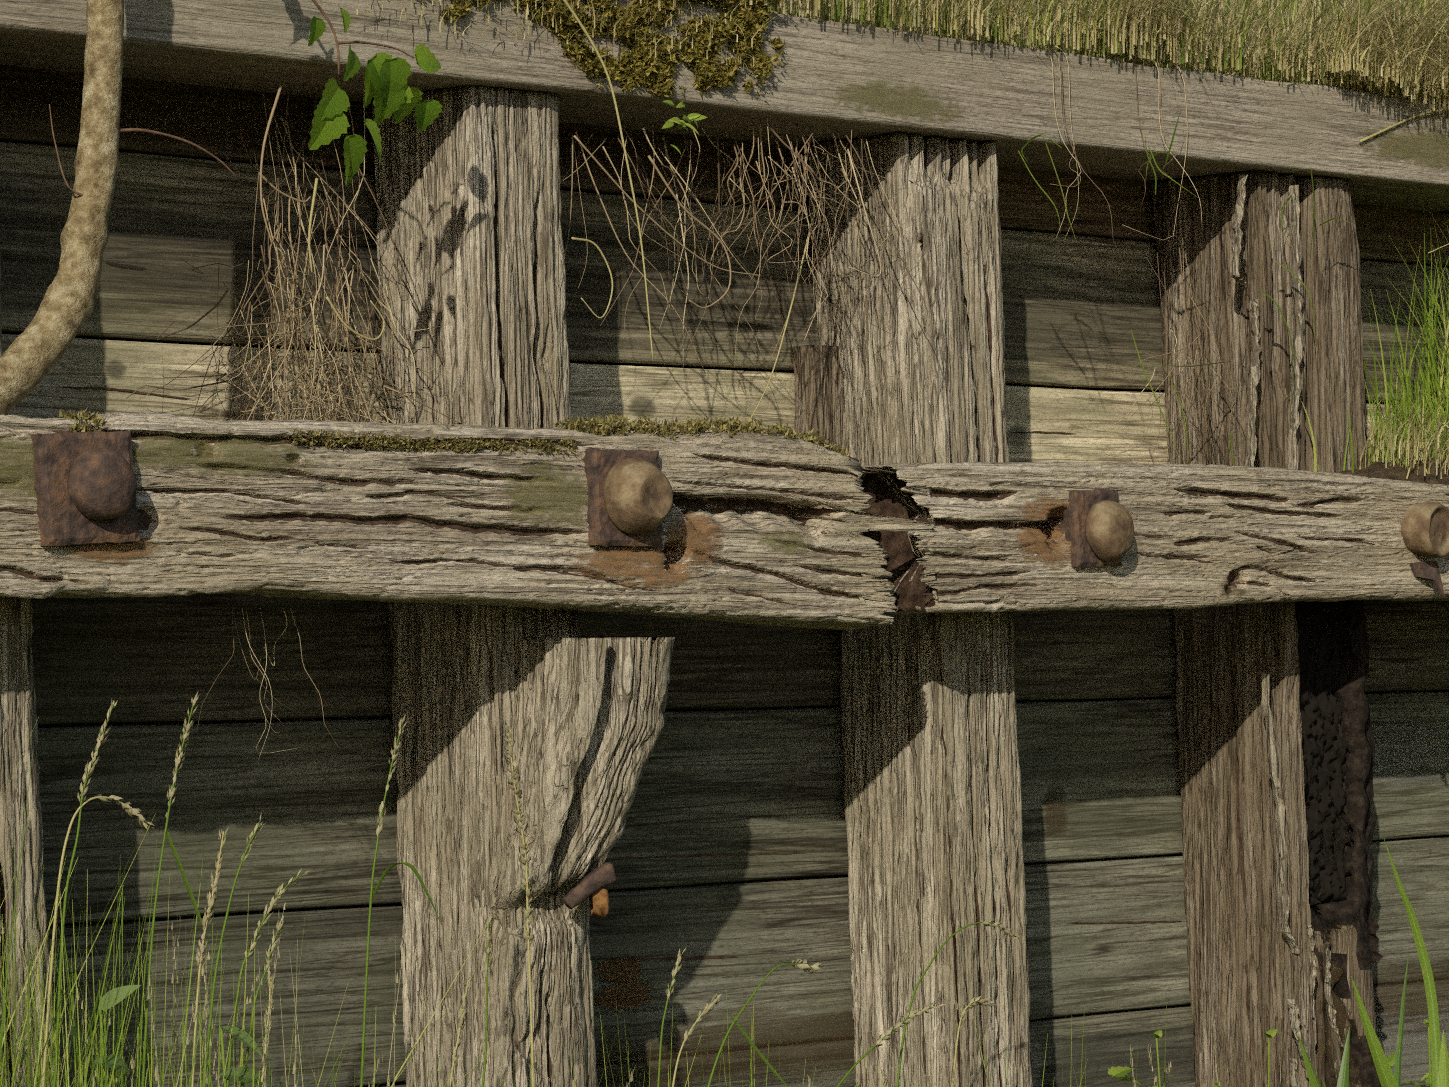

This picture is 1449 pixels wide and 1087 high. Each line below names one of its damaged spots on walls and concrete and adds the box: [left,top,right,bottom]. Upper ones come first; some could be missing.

crack [1243,276,1251,358]
crack [52,131,655,591]
crack [673,219,1076,605]
rust [72,538,156,563]
rust [580,514,720,587]
rust [1019,497,1072,568]
crack [1135,423,1375,592]
rust [589,886,609,918]
crack [908,646,1017,1087]
rust [594,958,653,1010]